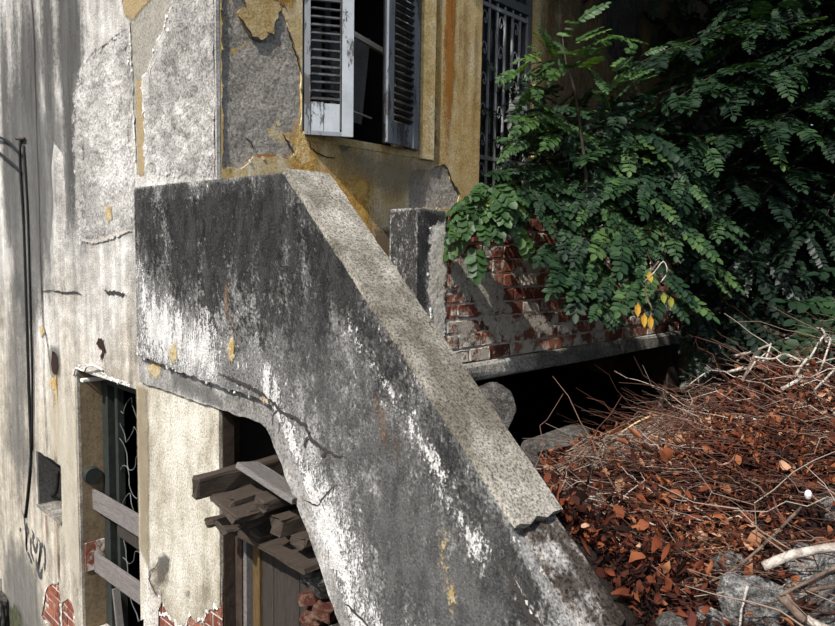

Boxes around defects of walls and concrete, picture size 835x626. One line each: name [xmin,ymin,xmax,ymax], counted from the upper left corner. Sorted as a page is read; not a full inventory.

water stain [0,0,83,483]
flaking render [71,0,312,248]
flaking render [408,163,459,210]
rust [435,0,456,138]
flaking render [425,221,552,347]
crack [218,373,347,458]
water stain [134,172,556,626]
flaking render [42,581,75,626]
flaking render [143,573,224,626]